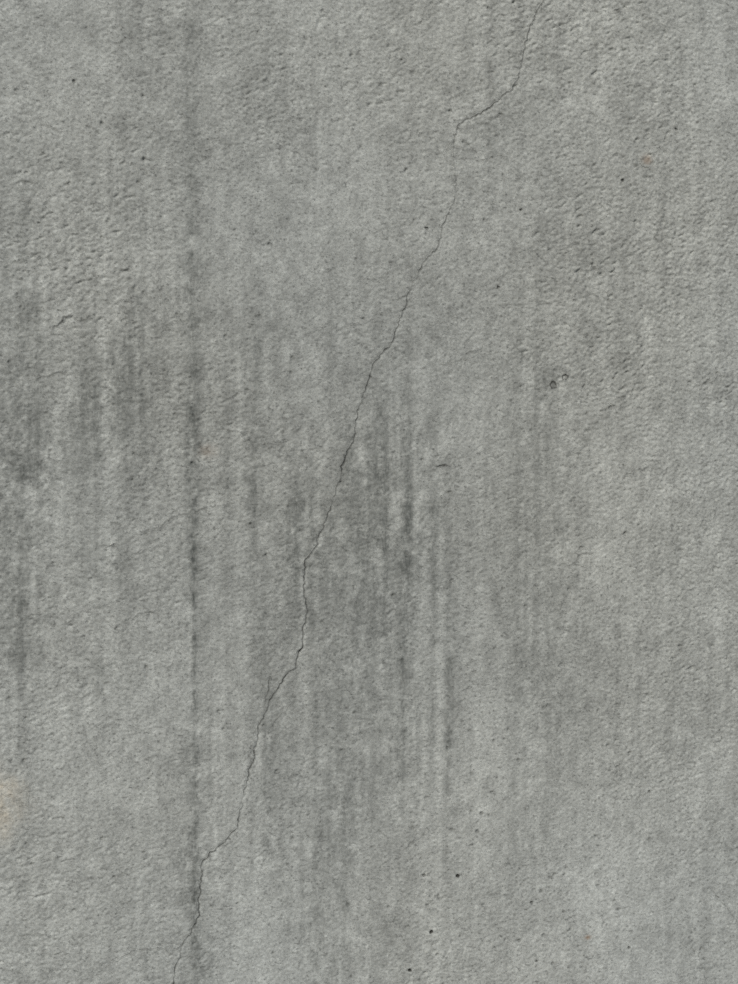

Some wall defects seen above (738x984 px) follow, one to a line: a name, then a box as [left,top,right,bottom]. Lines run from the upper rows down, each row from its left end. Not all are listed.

crack [105,0,545,984]